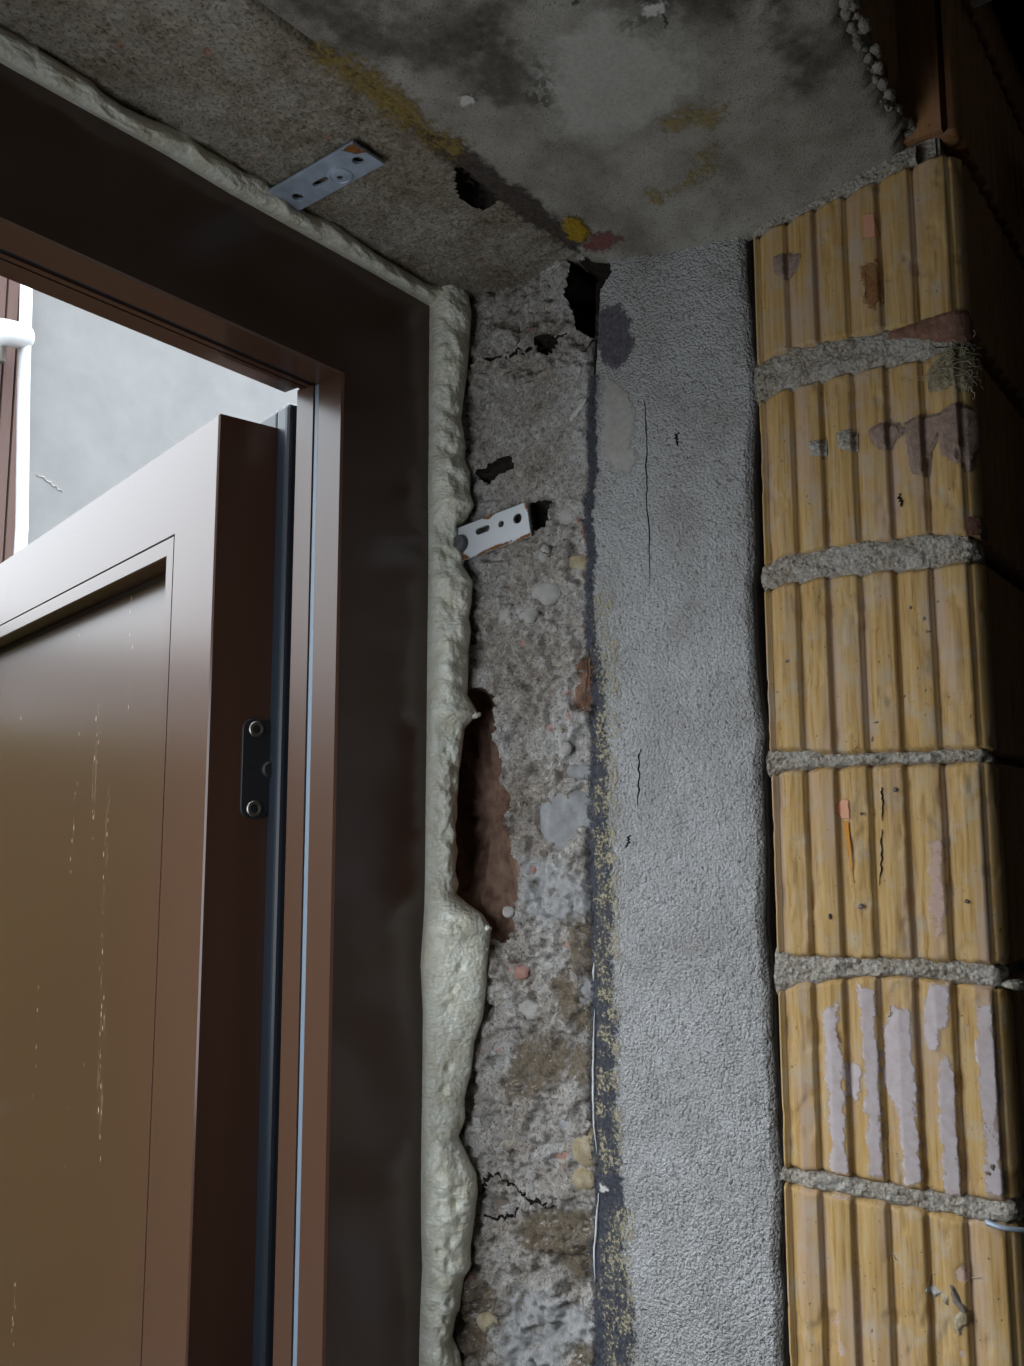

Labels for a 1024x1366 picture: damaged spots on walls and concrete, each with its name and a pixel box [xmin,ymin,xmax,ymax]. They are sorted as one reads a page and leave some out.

spalling [456,167,498,210]
spalling [565,258,612,341]
spalling [534,334,558,355]
spalling [475,456,514,484]
spalling [531,500,554,531]
spalling [455,687,521,951]
crack [481,1171,556,1221]